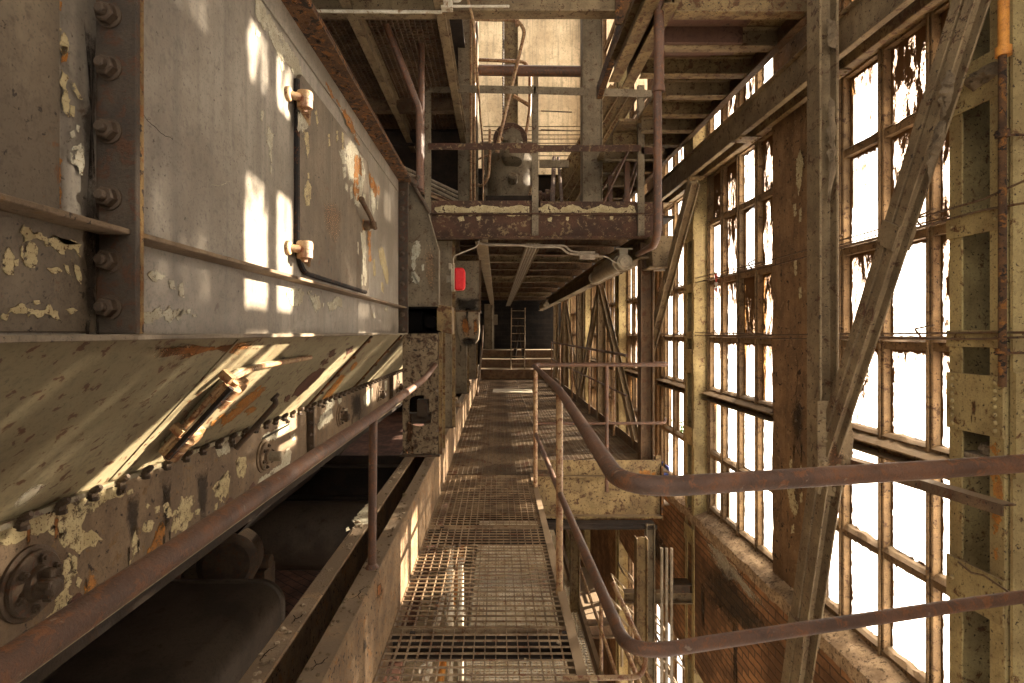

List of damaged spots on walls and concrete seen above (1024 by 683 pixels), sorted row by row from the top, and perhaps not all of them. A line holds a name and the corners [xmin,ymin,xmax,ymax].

peeling [60,69,85,176]
rust [326,83,380,201]
peeling [435,204,636,222]
peeling [2,225,82,284]
peeling [1,300,78,321]
rust [161,342,249,358]
rust [211,385,266,427]
peeling [0,486,133,619]
peeling [129,495,200,565]